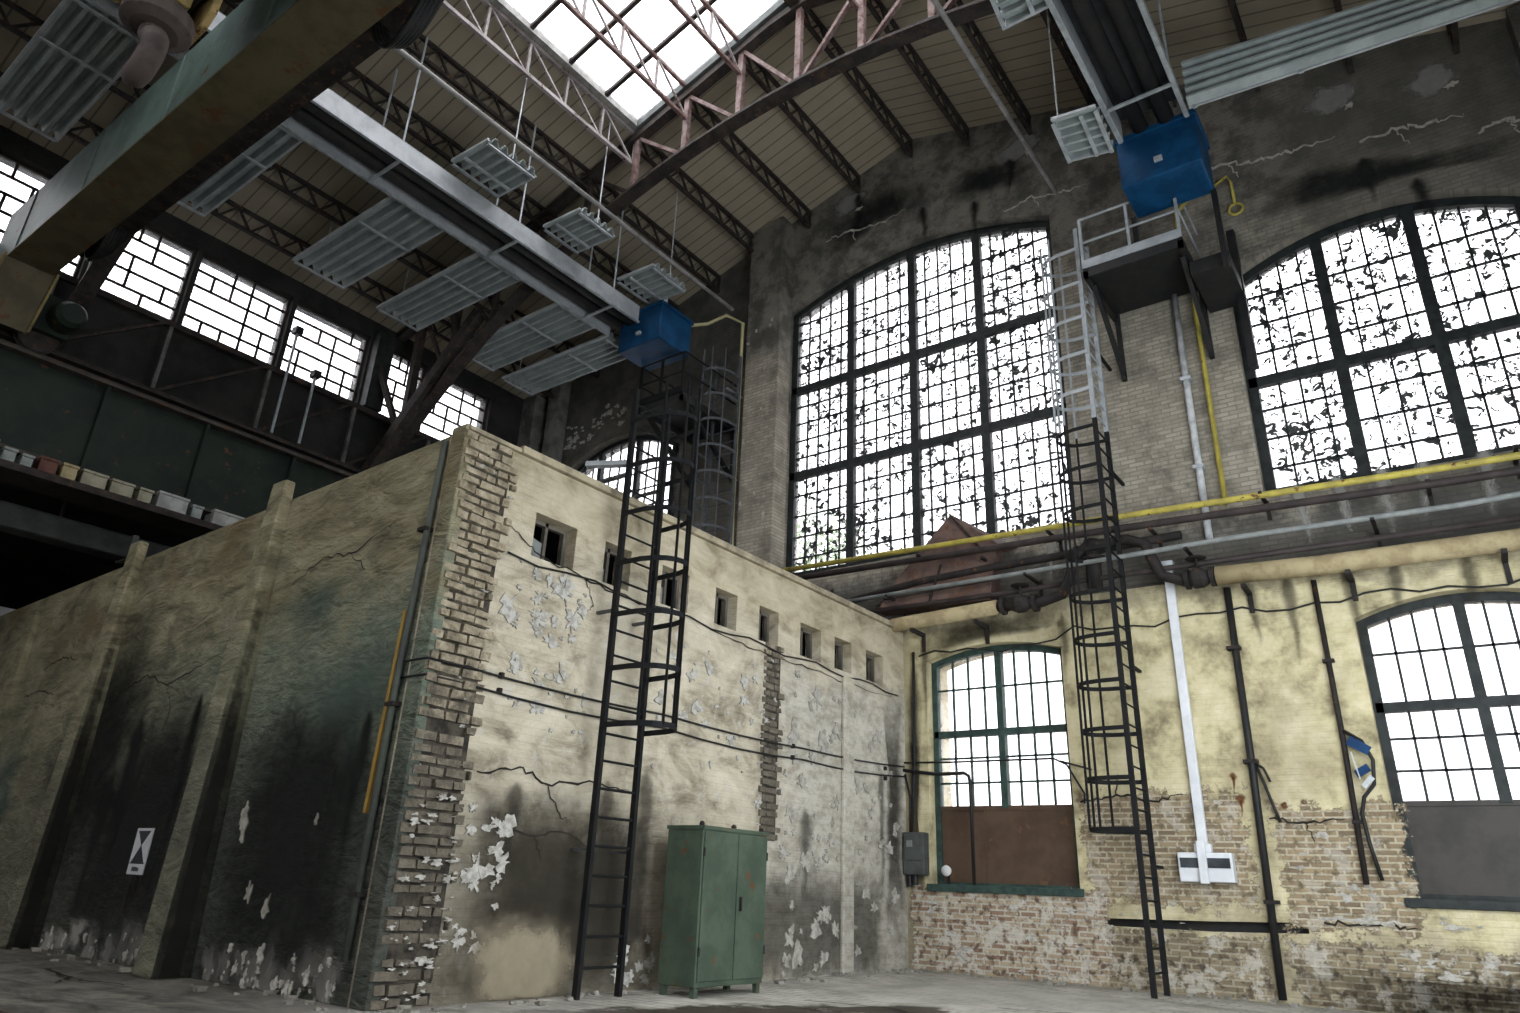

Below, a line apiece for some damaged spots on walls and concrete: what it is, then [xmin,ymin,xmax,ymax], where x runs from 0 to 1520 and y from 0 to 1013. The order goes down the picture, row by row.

crack [1211,114,1520,177]
peeling [40,921,143,966]
water stain [6,649,371,979]
peeling [202,943,338,1003]
spalling [368,429,587,1010]
crack [477,766,623,861]
spalling [636,642,900,977]
spalling [855,781,1520,1013]